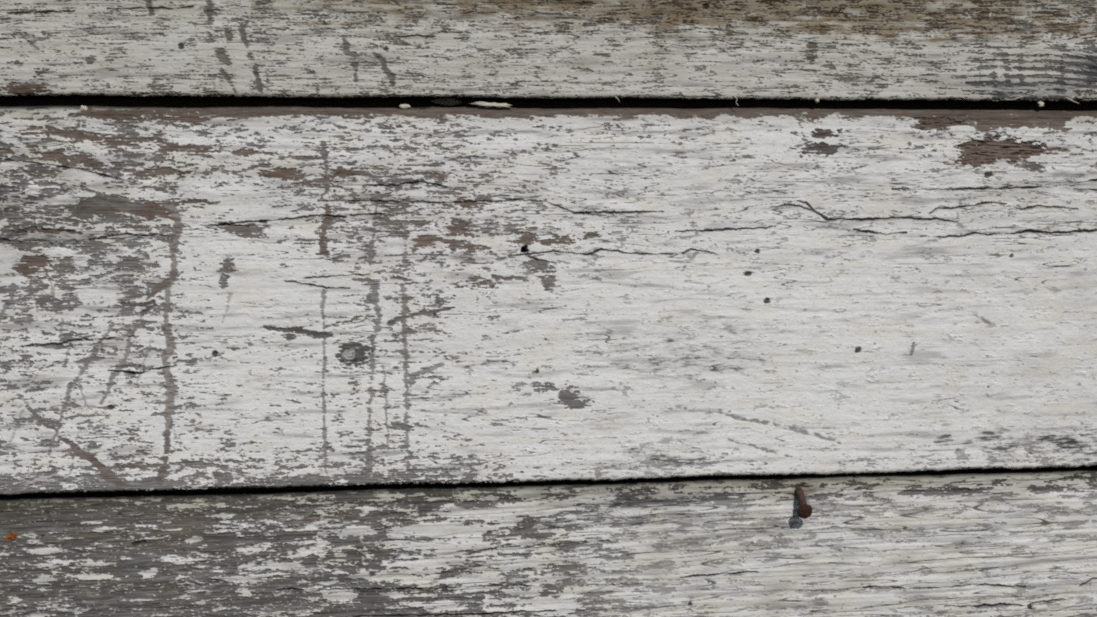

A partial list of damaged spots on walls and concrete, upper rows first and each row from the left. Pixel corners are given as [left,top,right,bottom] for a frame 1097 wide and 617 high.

peeling [0,68,58,96]
peeling [144,0,156,17]
peeling [204,0,264,96]
peeling [64,35,1097,158]
crack [85,179,1097,265]
peeling [0,126,652,617]